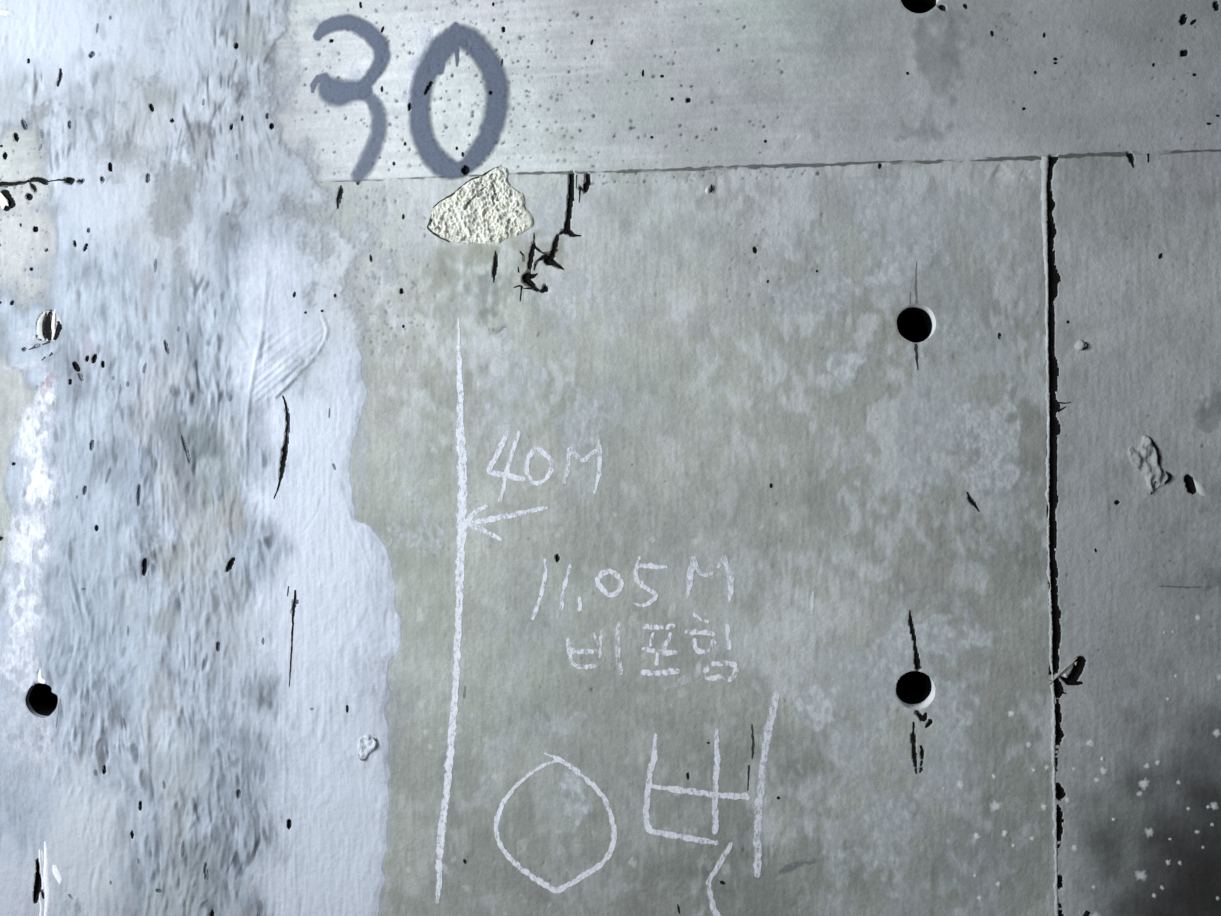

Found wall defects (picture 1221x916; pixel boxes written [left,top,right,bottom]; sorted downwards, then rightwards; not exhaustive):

crack [411,160,943,304]
crack [912,344,920,370]
crack [273,396,289,499]
leakage [0,386,59,765]
crack [966,492,979,512]
crack [975,150,1221,916]
crack [909,610,921,669]
crack [747,724,755,791]
crack [912,712,932,774]
leakage [1120,781,1221,916]